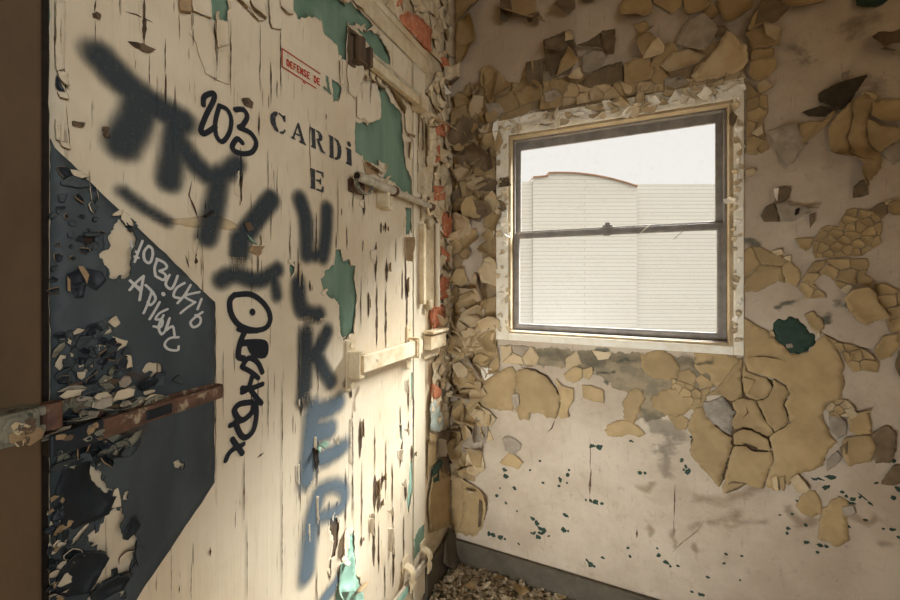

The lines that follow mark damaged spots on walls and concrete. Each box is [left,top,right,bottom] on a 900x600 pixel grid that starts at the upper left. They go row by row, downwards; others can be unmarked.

peeling [179,0,231,85]
peeling [47,166,138,298]
peeling [170,210,265,256]
peeling [242,0,900,559]
peeling [41,315,185,600]
peeling [329,512,369,600]